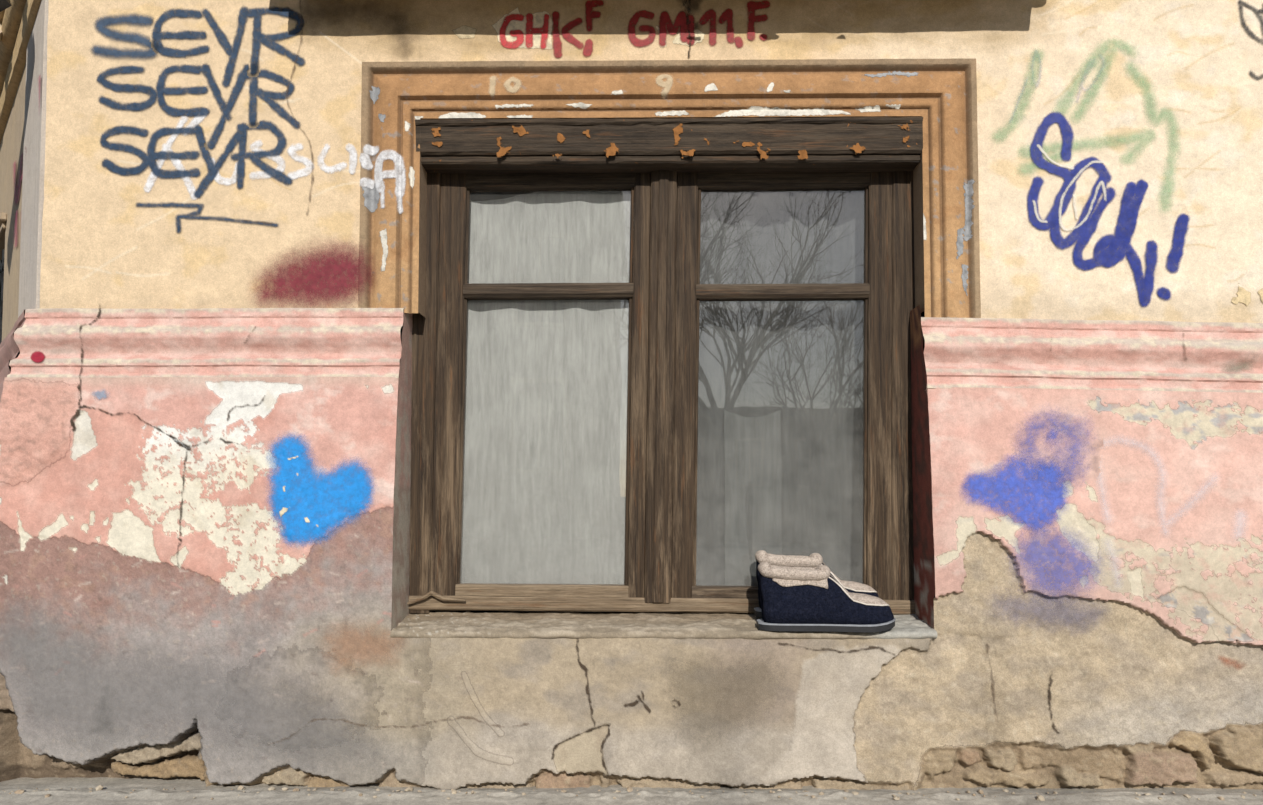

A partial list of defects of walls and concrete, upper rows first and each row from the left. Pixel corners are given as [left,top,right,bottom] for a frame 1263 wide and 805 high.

crack [70,308,257,564]
peeling [1087,396,1263,450]
peeling [1231,287,1263,306]
spalling [0,380,434,788]
crack [552,640,681,776]
spalling [456,480,1263,790]